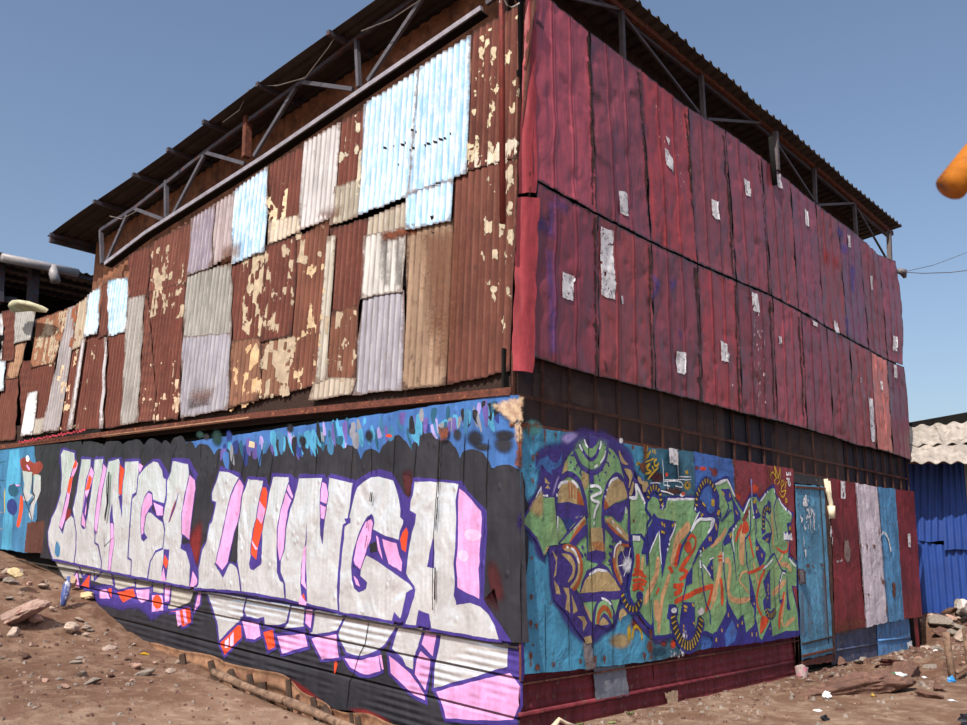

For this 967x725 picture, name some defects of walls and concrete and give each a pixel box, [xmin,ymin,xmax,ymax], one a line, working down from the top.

peeling [474,28,512,128]
peeling [266,188,288,229]
peeling [466,135,519,265]
corrosion [382,225,417,241]
peeling [485,281,511,302]
peeling [229,232,357,411]
corrosion [438,427,449,440]
corrosion [515,422,557,468]
corrosion [632,444,648,474]